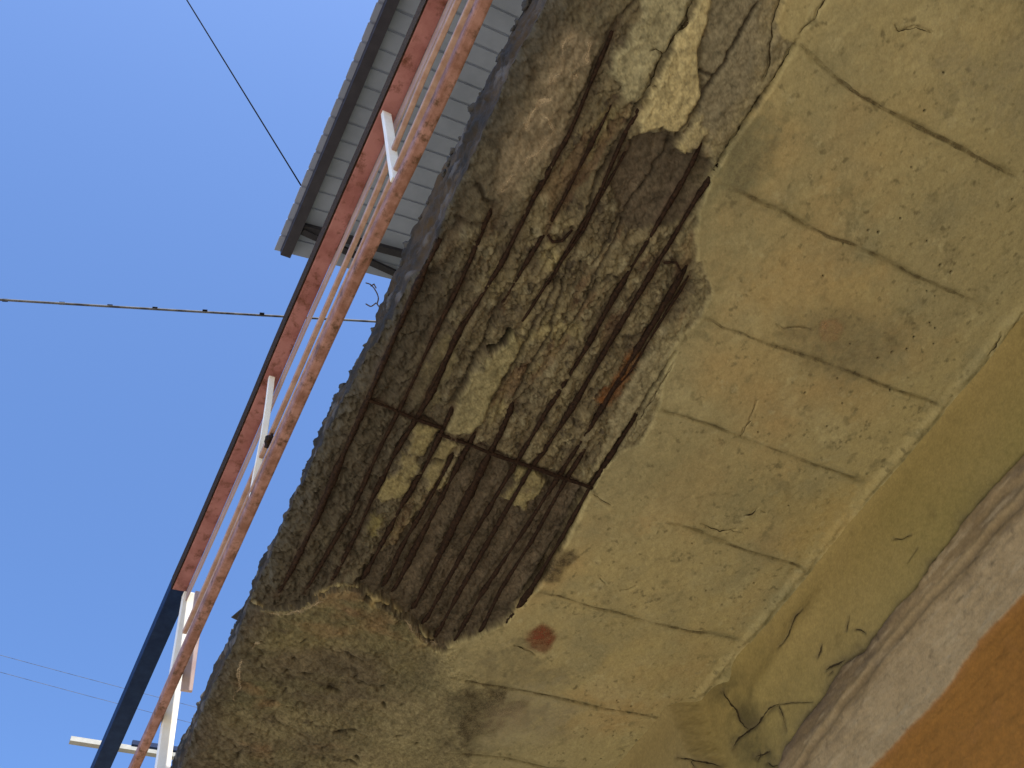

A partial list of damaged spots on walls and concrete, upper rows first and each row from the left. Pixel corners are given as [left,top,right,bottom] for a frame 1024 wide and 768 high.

spalling [250,0,794,649]
rust [529,625,555,651]
crack [723,691,808,767]